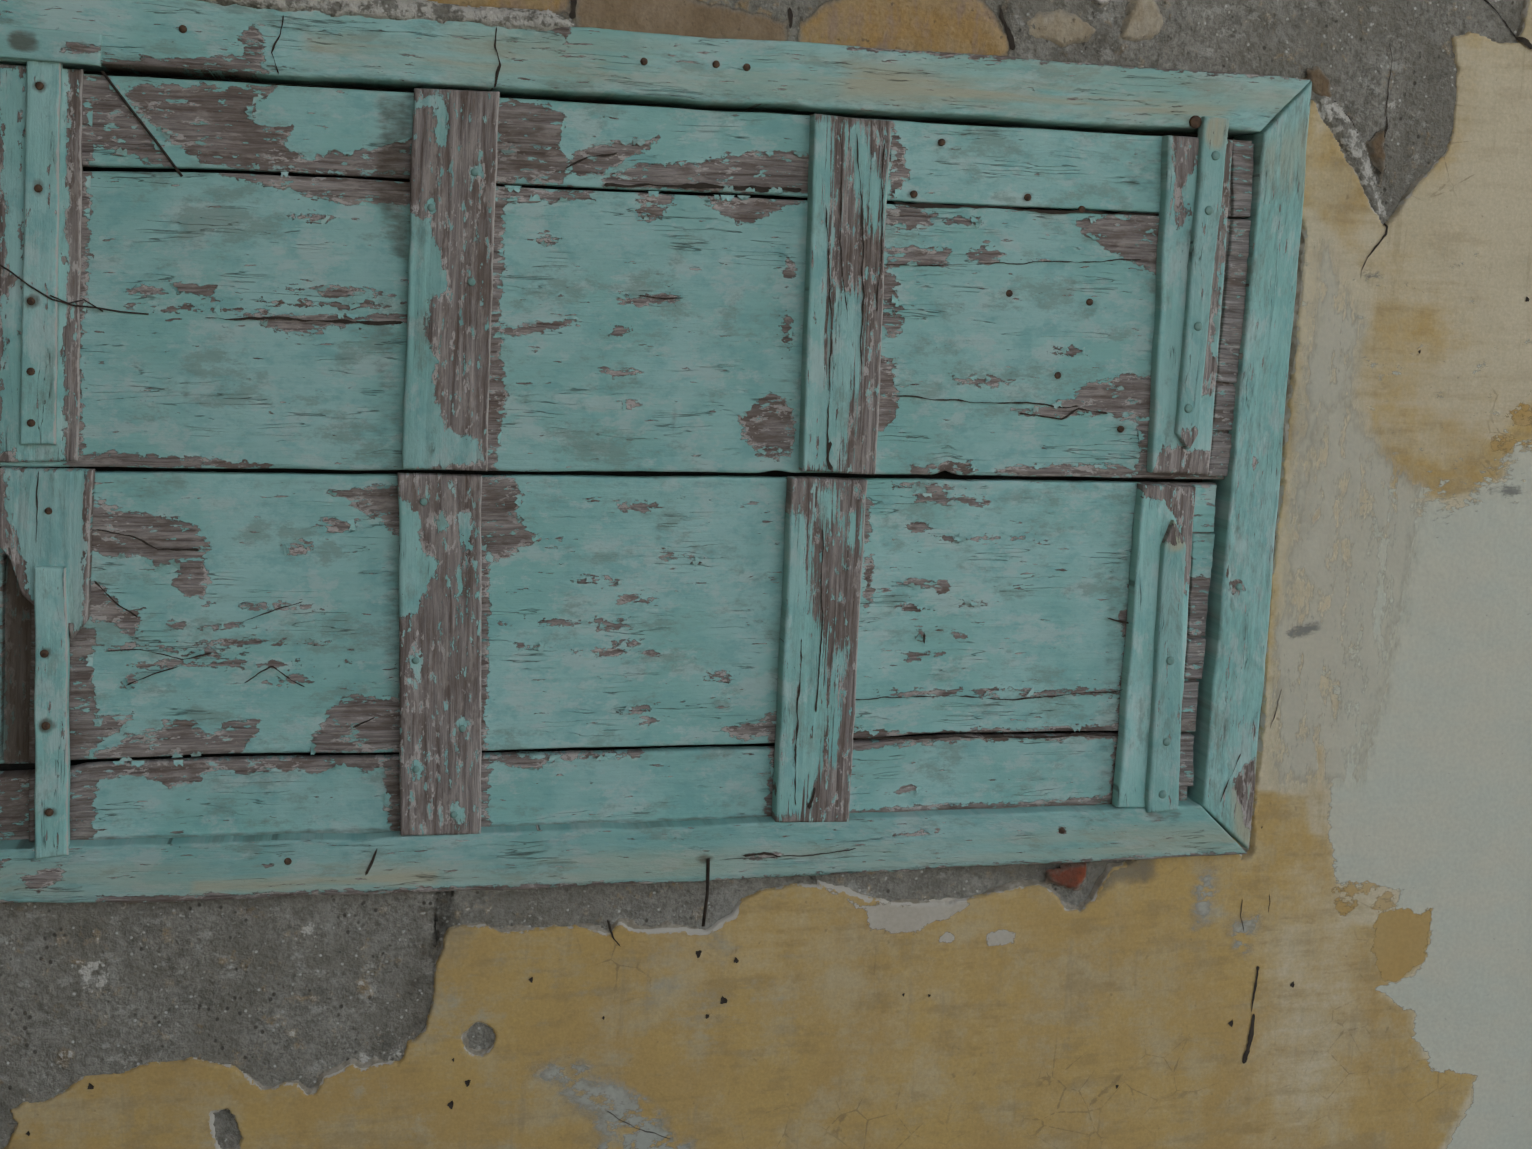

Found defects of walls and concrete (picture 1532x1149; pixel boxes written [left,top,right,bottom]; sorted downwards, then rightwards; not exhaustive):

flaking render [411,0,1524,224]
crack [1485,0,1532,49]
peeling [107,741,145,767]
peeling [172,752,201,788]
peeling [1273,345,1532,1149]
flaking render [0,860,1125,1149]